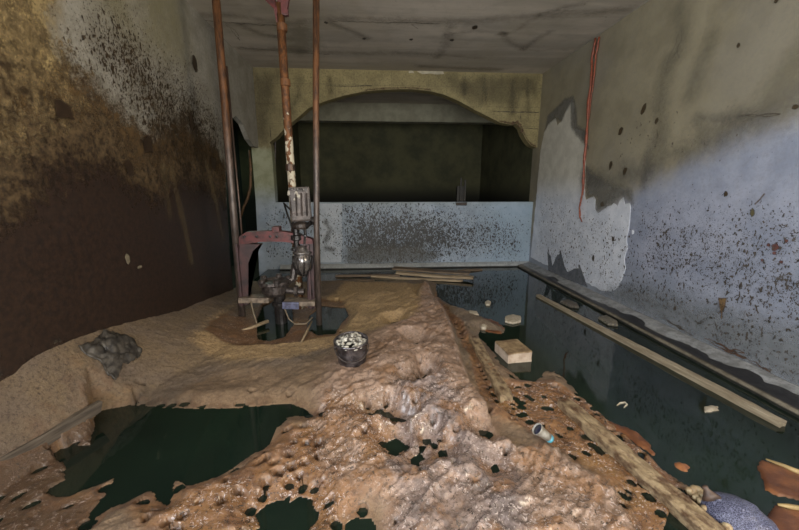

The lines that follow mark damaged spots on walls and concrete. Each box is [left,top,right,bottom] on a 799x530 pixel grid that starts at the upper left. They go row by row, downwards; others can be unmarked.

peeling [531,98,634,292]